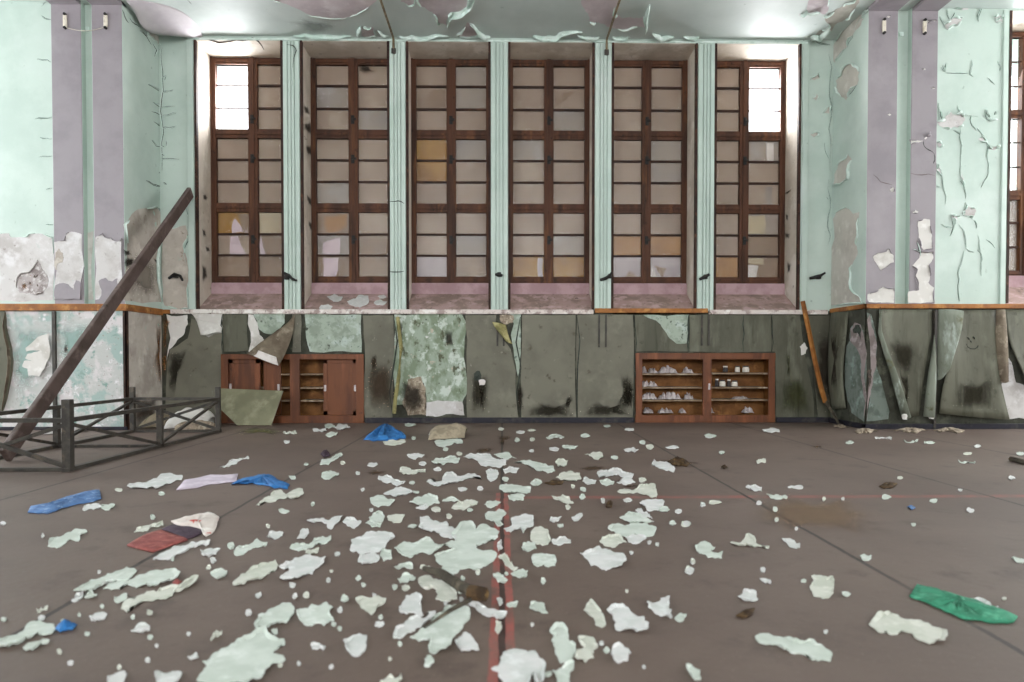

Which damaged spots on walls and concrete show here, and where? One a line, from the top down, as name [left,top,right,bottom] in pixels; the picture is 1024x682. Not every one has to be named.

crack [941,62,1001,85]
crack [874,103,997,301]
peeling [0,206,223,356]
peeling [908,210,935,303]
flaking render [644,315,689,344]
flaking render [831,207,894,421]
leakage [370,357,389,401]
flaking render [393,314,485,417]
leakage [535,398,571,416]
leakage [590,380,633,415]
leakage [960,384,988,405]
flaking render [1002,359,1024,419]